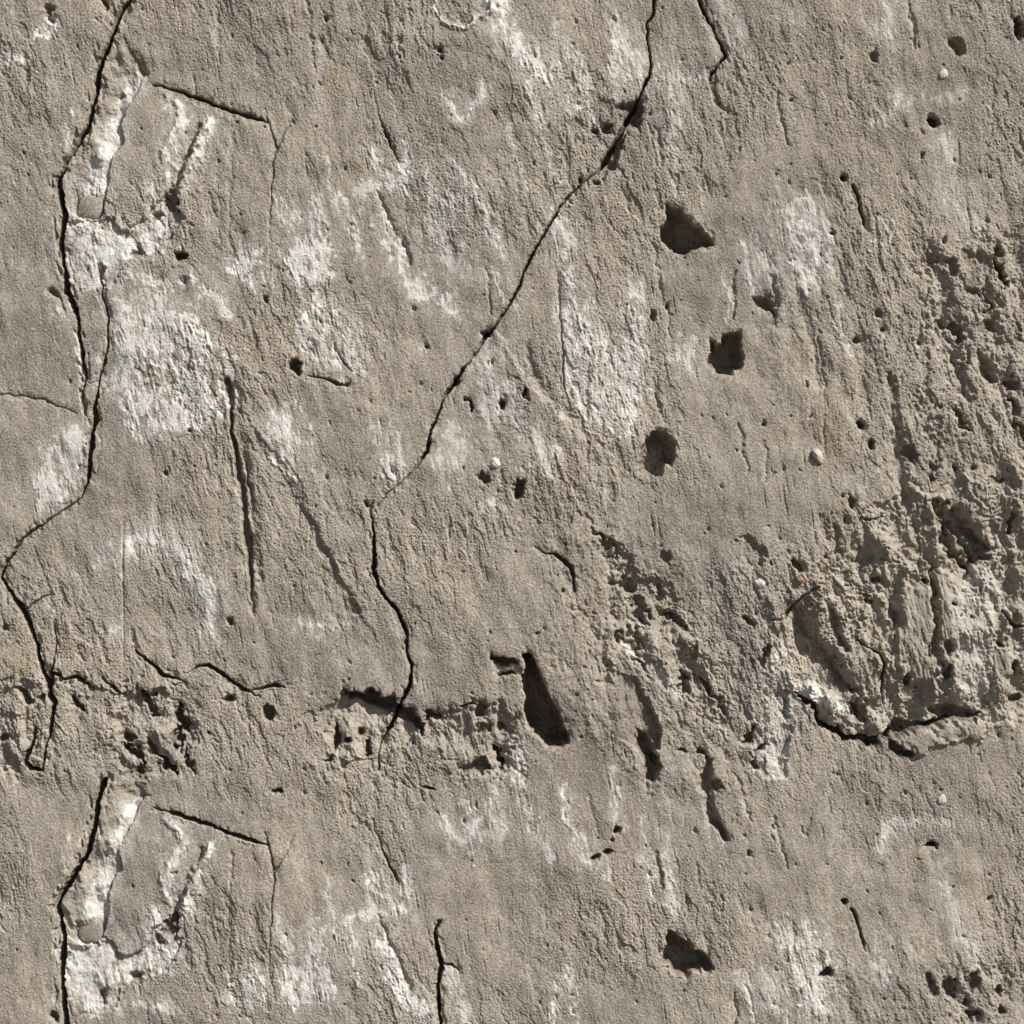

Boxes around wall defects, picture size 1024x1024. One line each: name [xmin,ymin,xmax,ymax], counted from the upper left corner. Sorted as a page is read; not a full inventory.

crack [697,0,730,115]
crack [0,0,133,773]
crack [368,0,658,772]
crack [134,649,286,699]
crack [56,777,109,1024]
crack [433,920,461,1024]